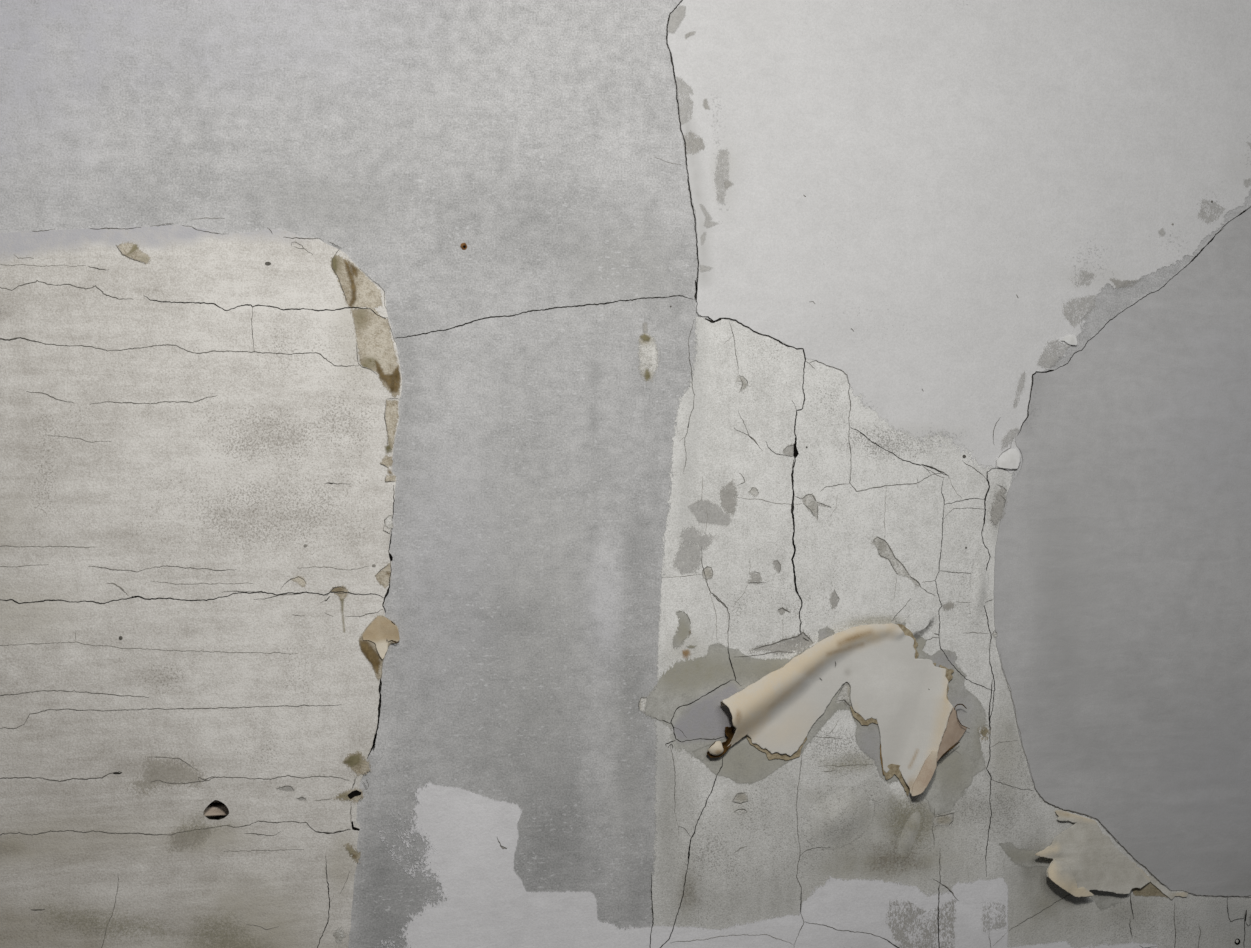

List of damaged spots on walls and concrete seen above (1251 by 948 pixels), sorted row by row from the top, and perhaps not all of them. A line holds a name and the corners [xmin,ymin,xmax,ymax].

crack [0,256,124,299]
crack [27,391,217,404]
crack [0,330,355,367]
spalling [331,251,402,482]
crack [145,0,1171,891]
crack [1018,207,1250,434]
crack [0,485,395,617]
spalling [375,563,391,588]
spalling [359,615,400,680]
peeling [638,610,991,827]
crack [0,676,382,948]
peeling [999,810,1188,910]